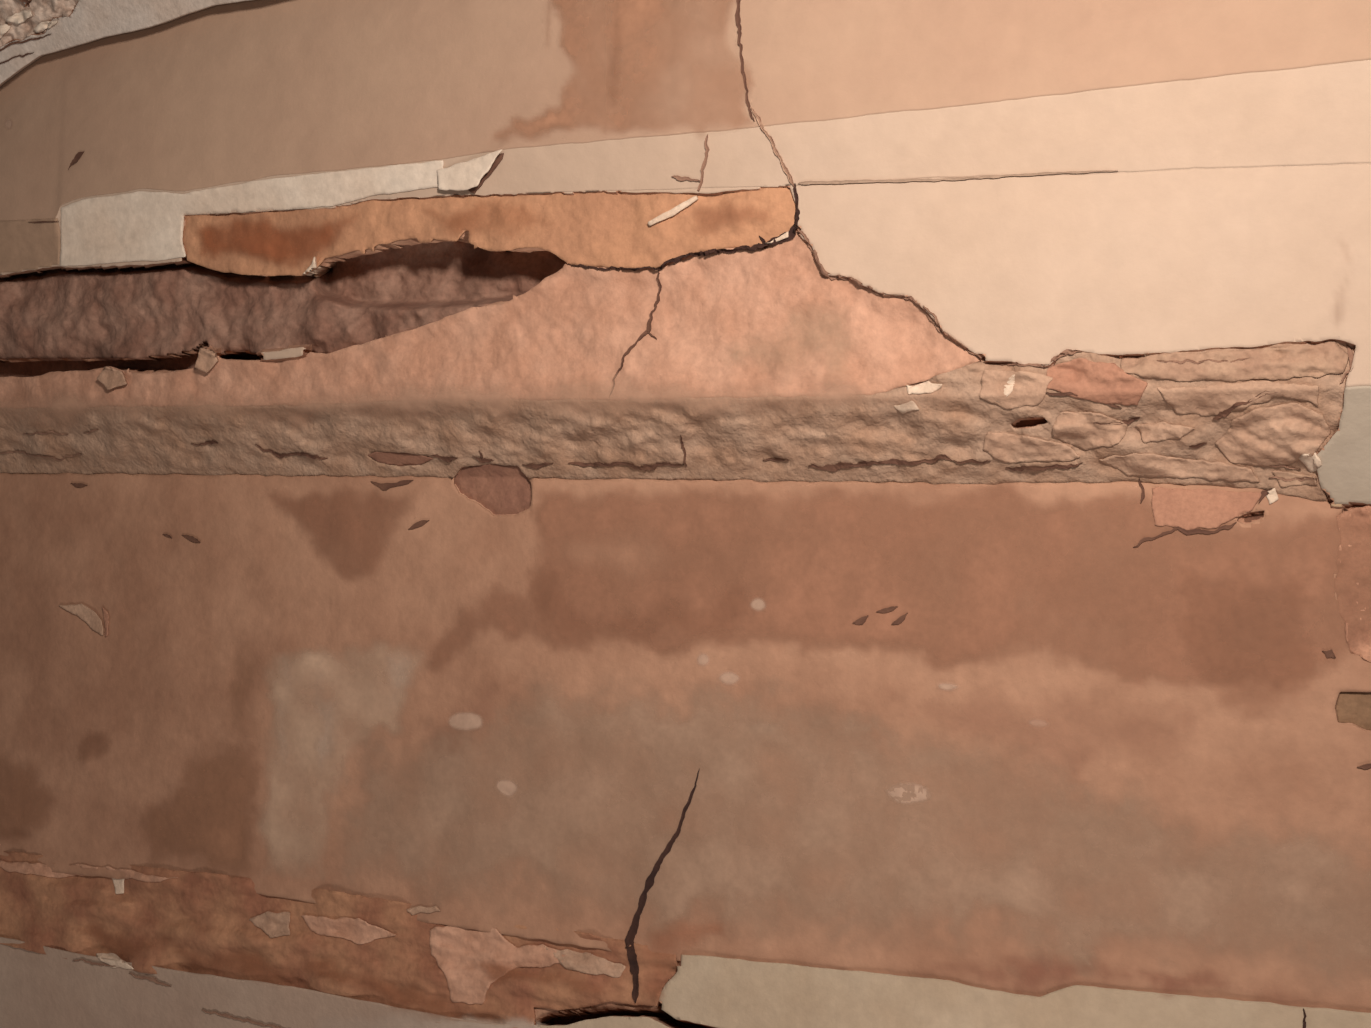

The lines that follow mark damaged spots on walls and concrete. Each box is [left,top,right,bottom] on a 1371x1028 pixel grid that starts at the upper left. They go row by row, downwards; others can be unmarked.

flaking render [0,0,79,47]
water stain [507,0,672,136]
crack [574,0,1113,396]
flaking render [0,149,1371,570]
crack [1094,404,1140,425]
crack [1157,357,1248,365]
crack [1340,345,1354,384]
water stain [438,486,1371,681]
peeling [0,464,1371,1025]
crack [546,768,707,1028]